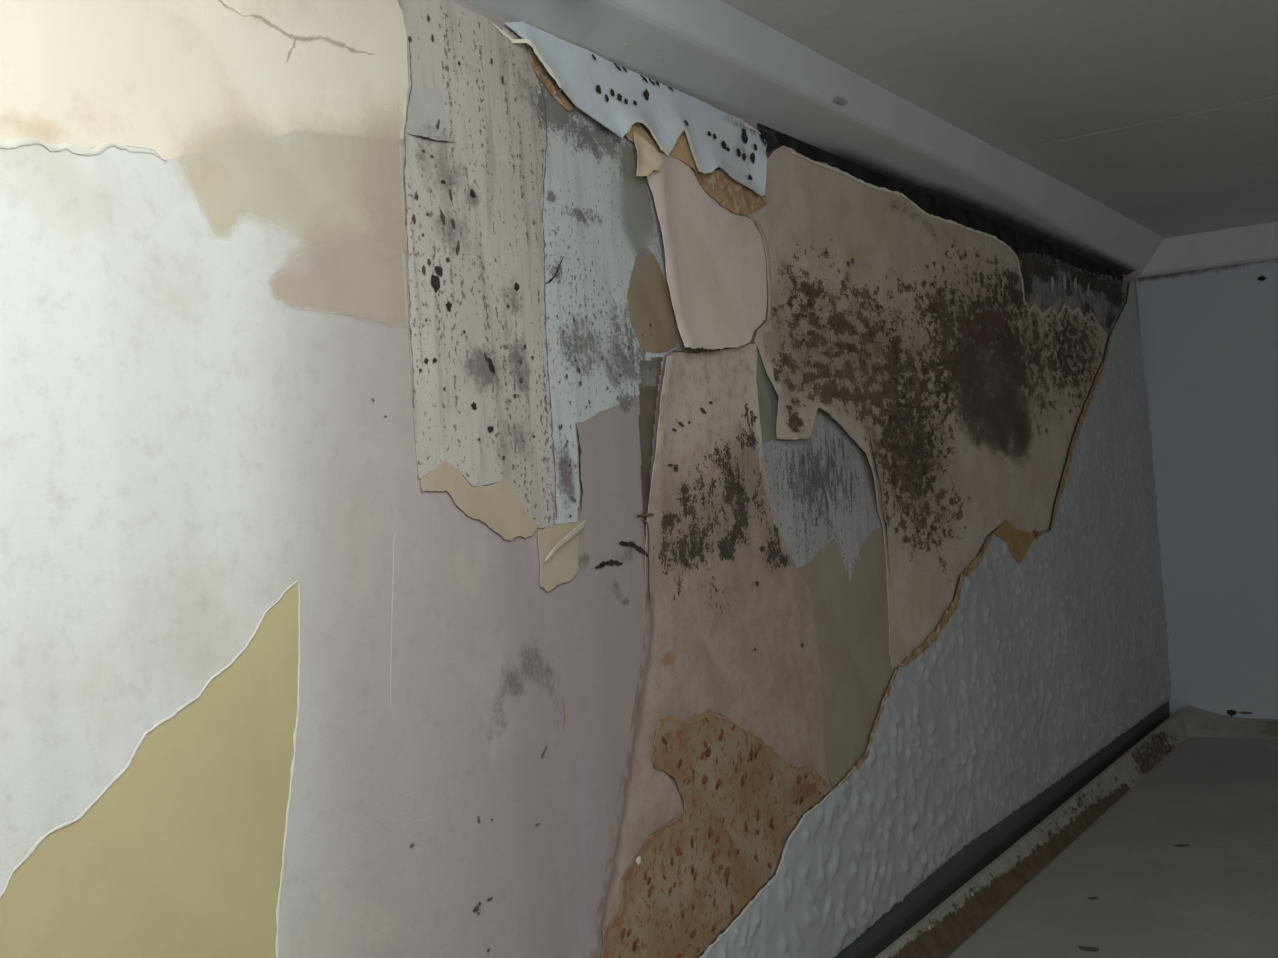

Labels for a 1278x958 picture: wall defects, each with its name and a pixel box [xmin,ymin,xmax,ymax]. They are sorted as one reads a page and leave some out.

crack [219,0,370,63]
water stain [596,75,674,105]
water stain [187,119,460,321]
water stain [467,350,499,386]
flaking render [399,0,678,592]
water stain [559,323,792,621]
peeling [756,356,895,788]
water stain [708,123,1266,582]
flaking render [1019,251,1127,335]
peeling [0,580,300,958]
corrosion [601,710,830,958]
peeling [888,731,1178,958]